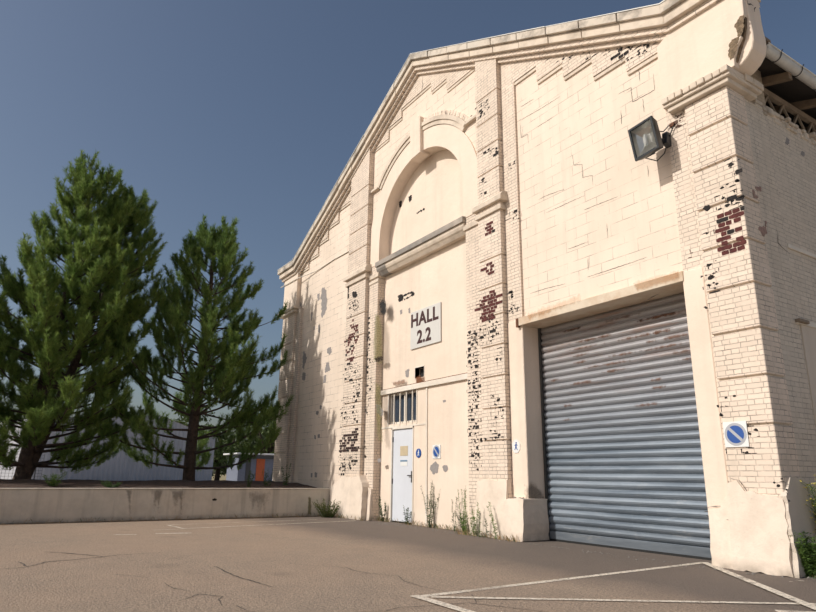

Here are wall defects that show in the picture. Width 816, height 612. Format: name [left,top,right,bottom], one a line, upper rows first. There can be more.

flaking render [547,43,655,62]
spalling [728,15,745,60]
crack [619,72,655,124]
flaking render [700,158,762,309]
peeling [311,287,327,333]
flaking render [338,287,383,475]
flaking render [466,290,519,471]